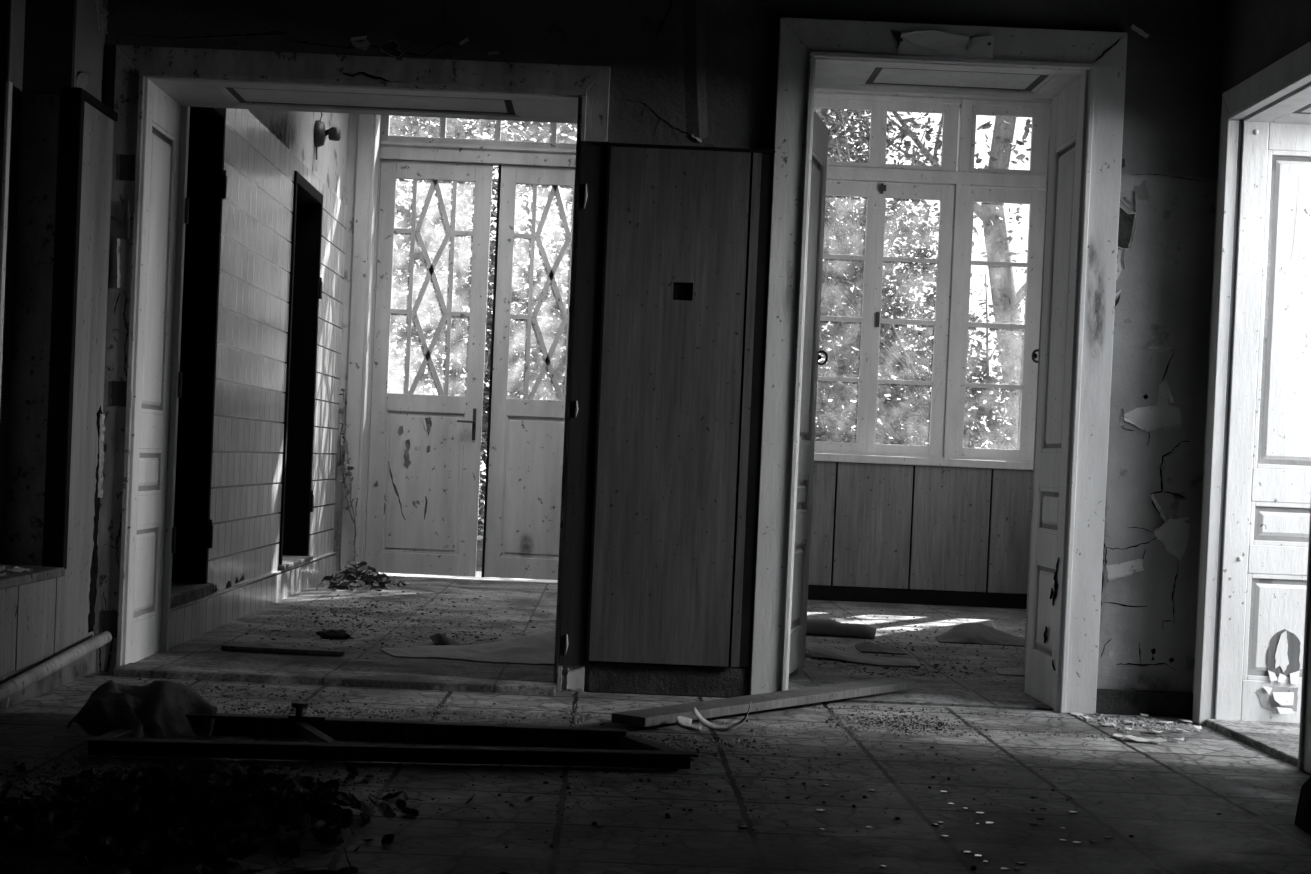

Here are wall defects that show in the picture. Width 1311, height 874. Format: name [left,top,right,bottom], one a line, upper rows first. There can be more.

peeling [1109,380,1183,432]
crack [1100,395,1192,670]
peeling [1151,492,1190,561]
peeling [1106,559,1144,582]